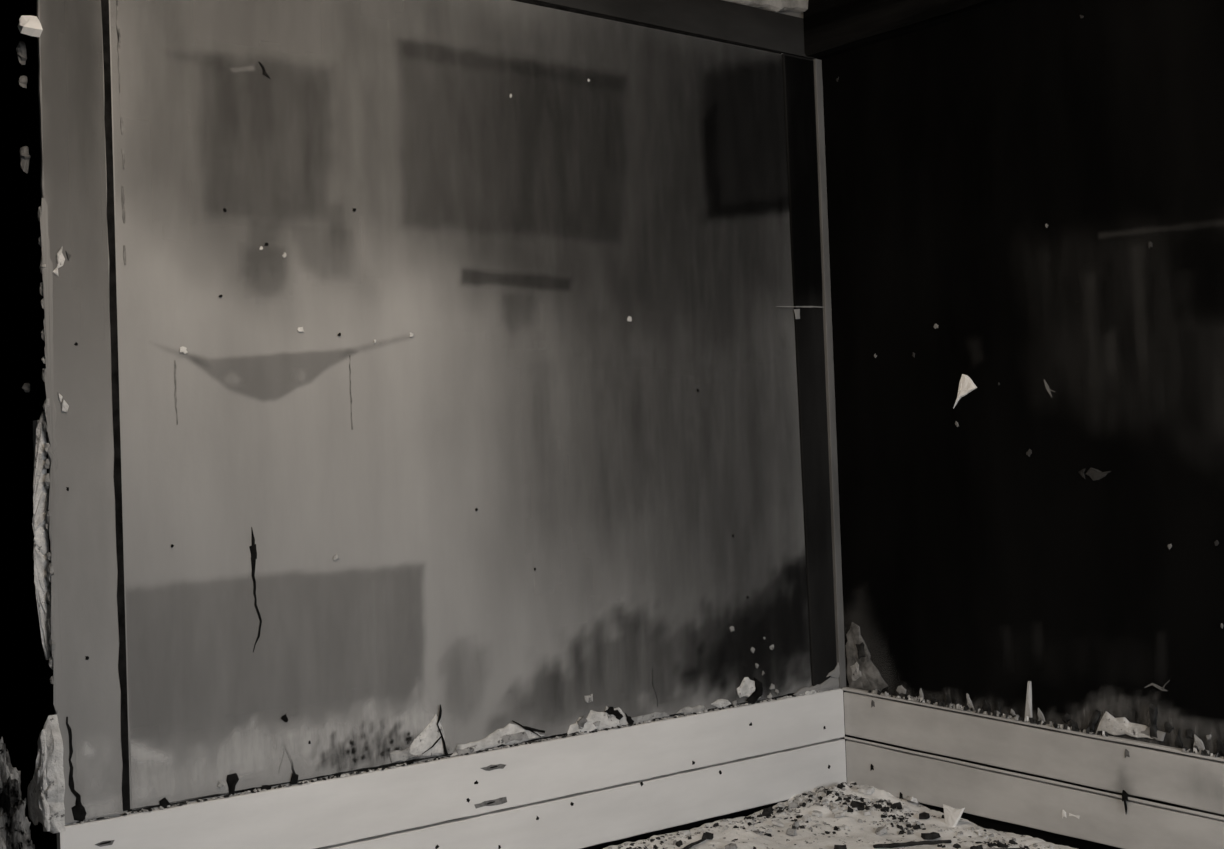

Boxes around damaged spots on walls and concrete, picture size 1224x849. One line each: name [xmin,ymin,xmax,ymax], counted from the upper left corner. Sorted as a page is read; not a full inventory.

flaking render [27,198,87,834]
crack [249,527,262,652]
damp [688,565,811,691]